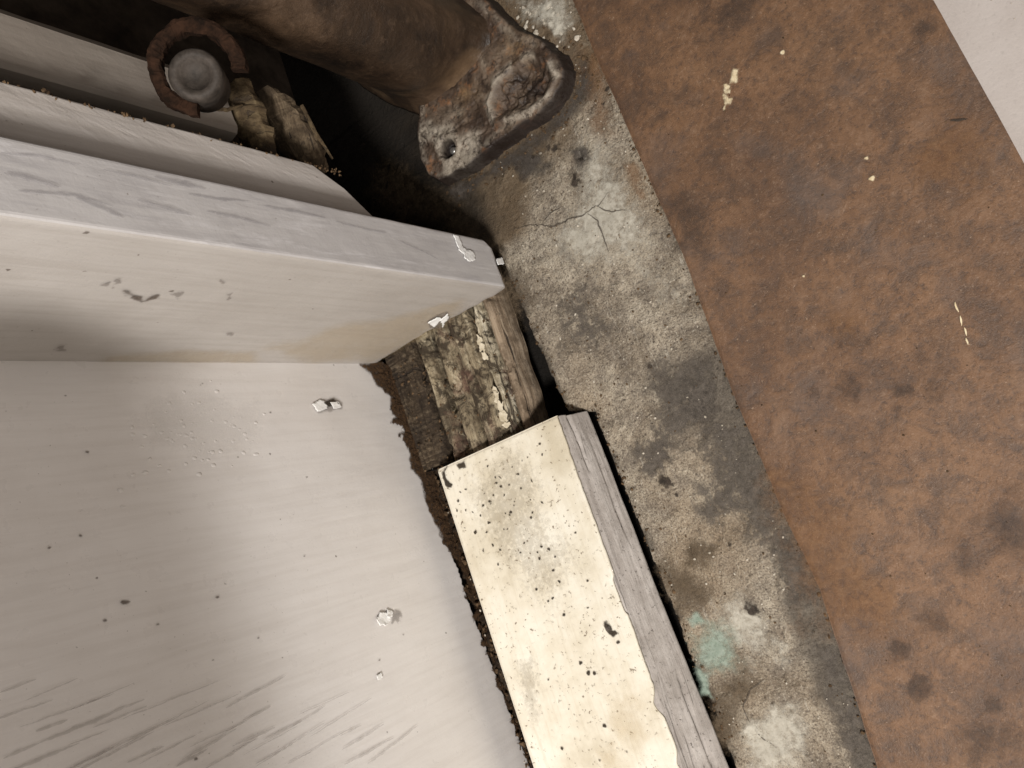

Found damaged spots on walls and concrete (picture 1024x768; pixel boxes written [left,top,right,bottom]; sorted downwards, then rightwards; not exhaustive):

peeling [453,234,475,262]
crack [511,197,627,252]
leakage [632,360,817,603]
leakage [662,543,802,768]